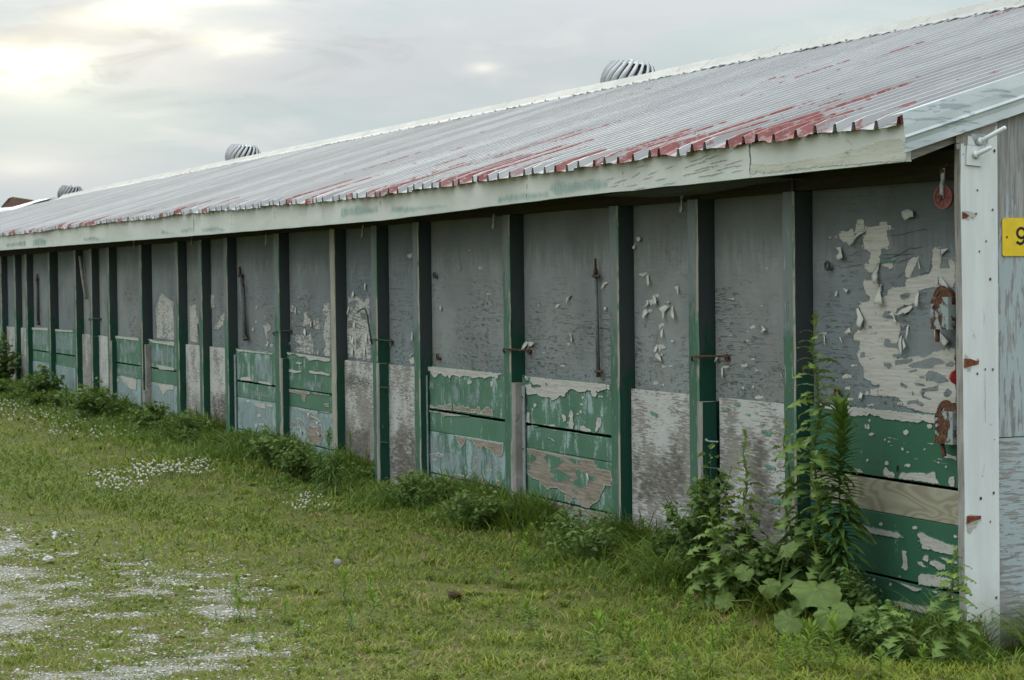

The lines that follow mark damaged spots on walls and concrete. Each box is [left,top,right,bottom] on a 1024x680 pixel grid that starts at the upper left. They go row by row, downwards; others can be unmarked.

peeling [117,368,137,401]
peeling [115,291,175,371]
peeling [151,383,174,412]
peeling [347,283,372,362]
peeling [428,366,503,418]
peeling [636,271,678,368]
peeling [820,209,957,486]
corrosion [964,353,994,375]
peeling [429,435,504,493]
peeling [522,365,612,526]
corrosion [967,514,991,533]
peeling [862,522,959,615]